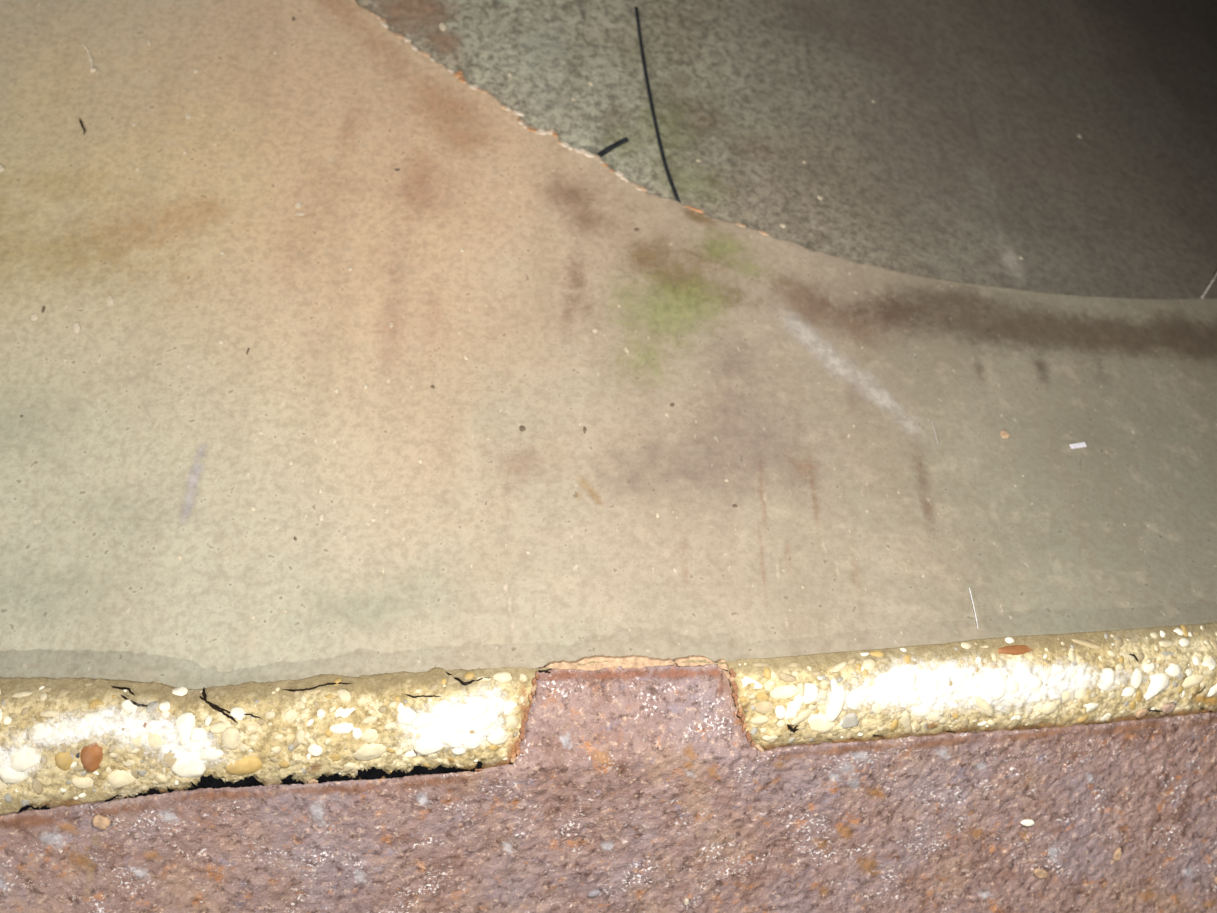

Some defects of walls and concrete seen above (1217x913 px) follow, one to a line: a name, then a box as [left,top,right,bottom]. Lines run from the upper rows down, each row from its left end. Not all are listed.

spalling [499,104,647,192]
corrosion [406,655,793,786]
corrosion [814,723,991,754]
corrosion [1006,722,1057,741]
corrosion [1085,689,1217,734]
corrosion [293,778,375,793]
corrosion [0,799,81,830]